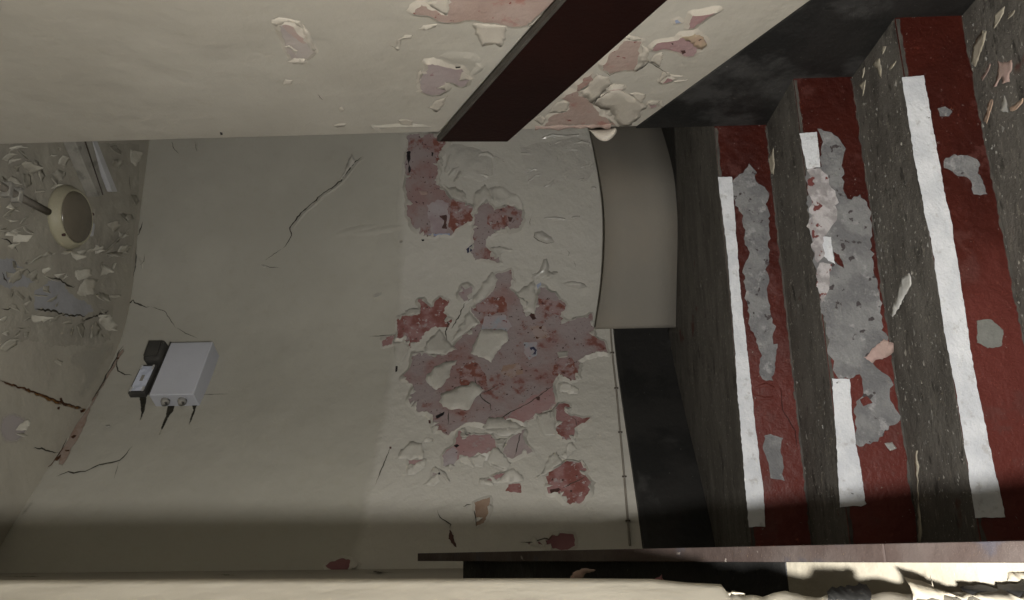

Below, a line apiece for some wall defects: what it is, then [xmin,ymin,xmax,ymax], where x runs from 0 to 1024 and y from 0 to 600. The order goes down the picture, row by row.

peeling [390,0,556,52]
peeling [534,6,724,141]
peeling [0,142,143,352]
crack [93,346,130,398]
crack [130,255,194,337]
crack [267,155,364,259]
peeling [379,132,610,530]
peeling [732,164,778,381]
peeling [805,129,912,451]
peeling [944,154,987,195]
peeling [977,319,1004,348]
crack [35,439,129,477]